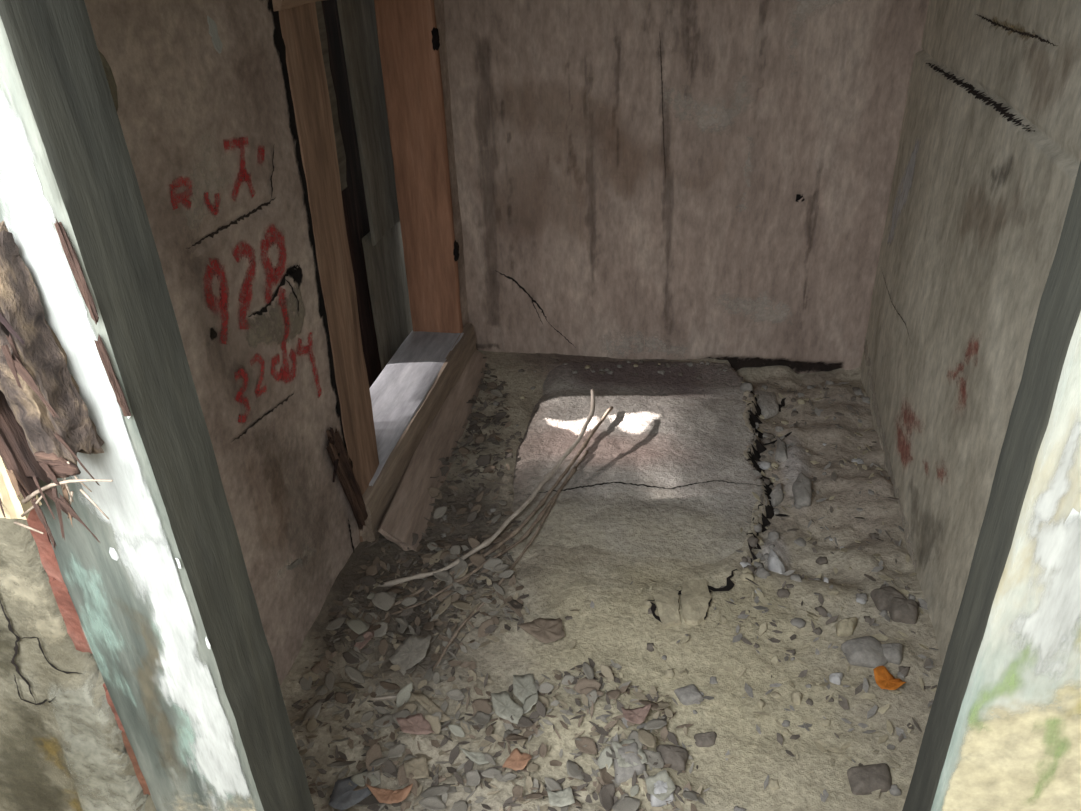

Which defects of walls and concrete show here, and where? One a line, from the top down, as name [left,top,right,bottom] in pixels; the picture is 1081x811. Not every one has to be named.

crack [976,14,1056,46]
crack [926,63,1035,132]
spalling [268,0,353,469]
spalling [245,266,305,348]
crack [496,271,576,348]
peeling [0,92,249,811]
crack [527,391,792,623]
peeling [1013,422,1081,674]
crack [0,600,82,705]